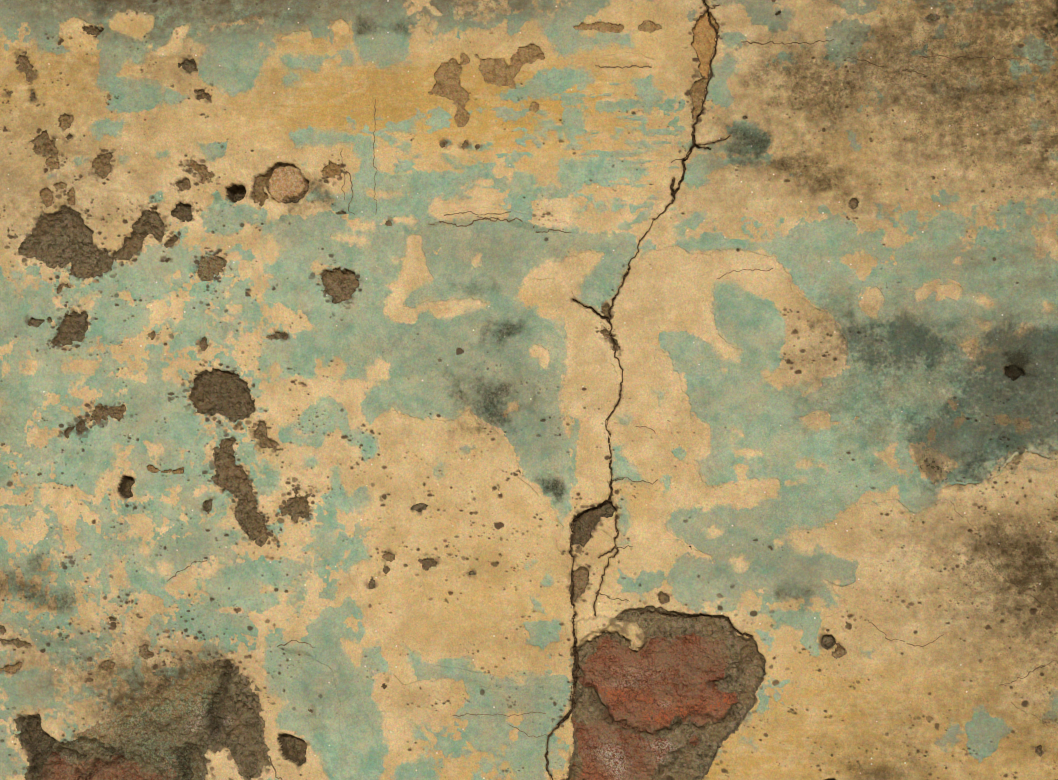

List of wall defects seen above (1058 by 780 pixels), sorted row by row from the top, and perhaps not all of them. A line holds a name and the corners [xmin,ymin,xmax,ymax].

peeling [428,43,545,127]
spalling [30,113,73,172]
spalling [92,153,112,179]
spalling [18,160,215,294]
spalling [319,268,360,304]
spalling [189,368,277,448]
crack [452,0,1058,780]
spalling [202,437,269,547]
peeling [349,234,1058,780]
spalling [137,644,154,659]
spalling [13,659,272,780]